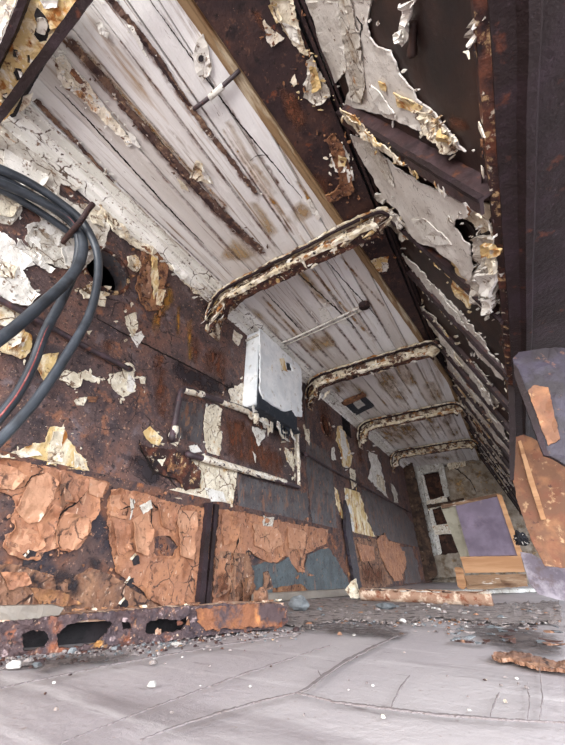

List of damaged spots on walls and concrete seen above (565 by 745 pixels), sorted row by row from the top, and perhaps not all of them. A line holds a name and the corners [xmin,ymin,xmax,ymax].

peeling [36,0,58,35]
spalling [19,93,117,183]
spalling [52,38,268,254]
peeling [0,123,232,326]
peeling [259,0,514,493]
rust [154,289,172,326]
rust [174,330,234,395]
peeling [0,400,421,612]
rust [177,574,286,631]
crack [0,633,300,689]
crack [60,645,330,744]
crack [140,635,565,741]